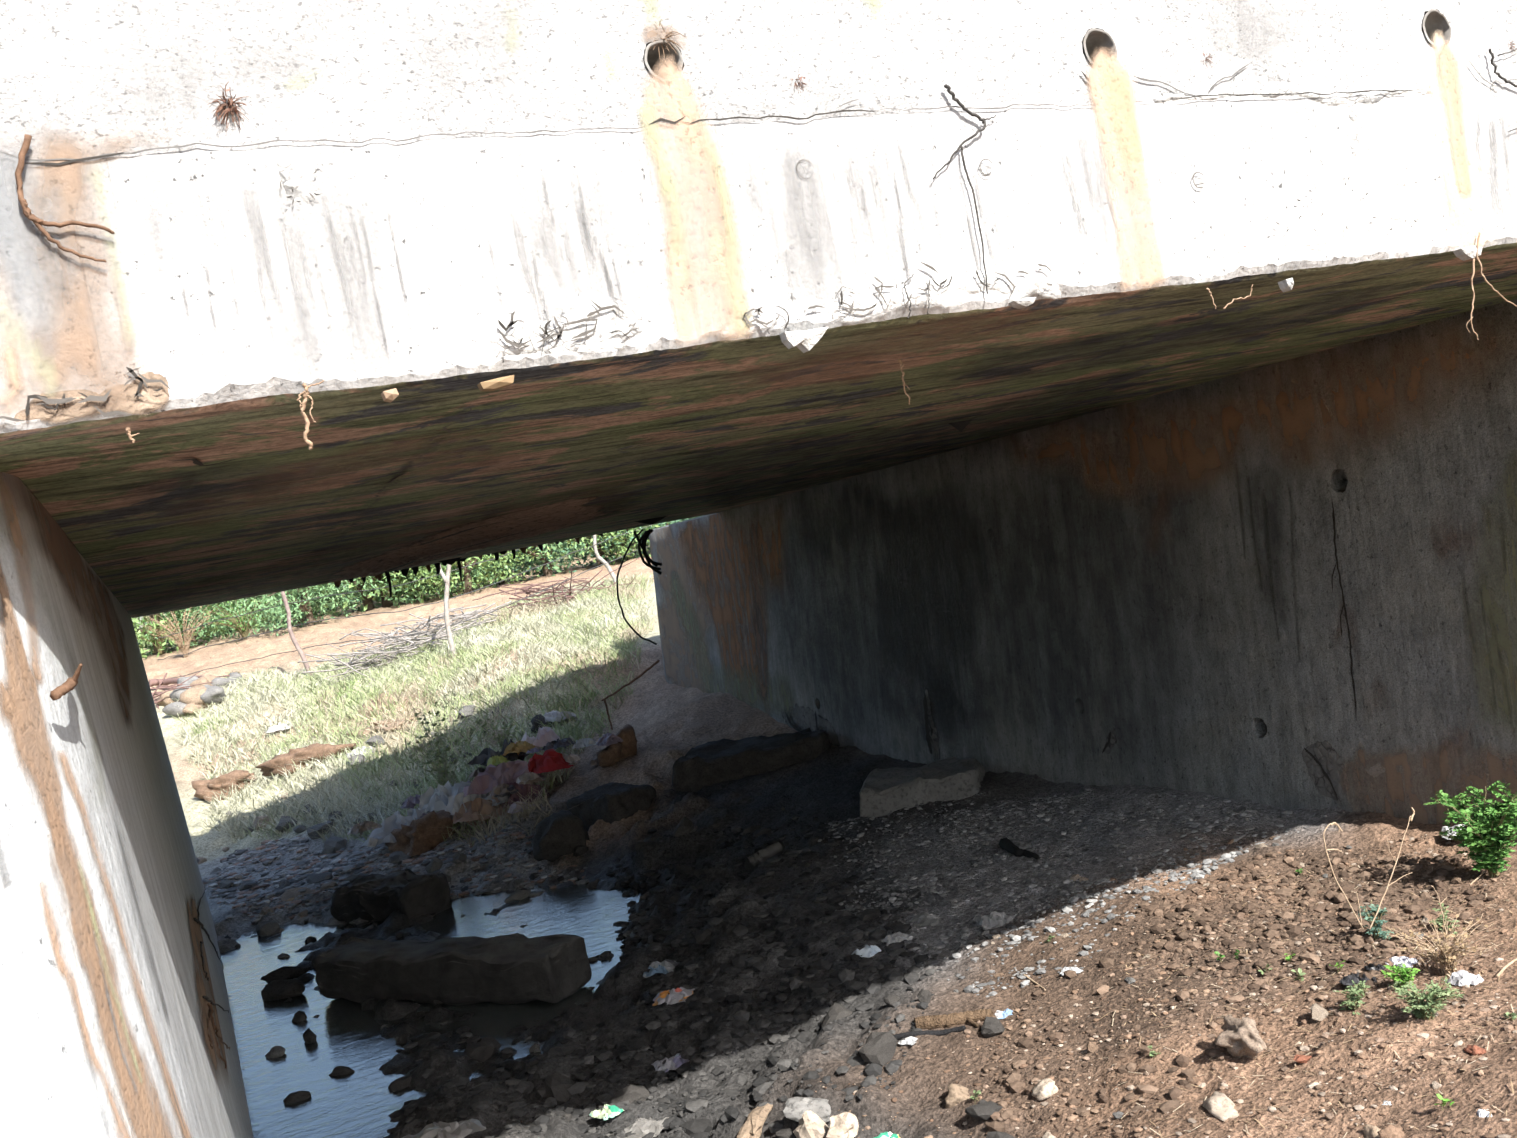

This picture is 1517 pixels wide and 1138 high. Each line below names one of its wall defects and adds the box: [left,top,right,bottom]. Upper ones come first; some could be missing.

crack [0,71,1094,166]
crack [1134,76,1201,102]
damp [514,188,620,316]
spalling [489,289,642,358]
spalling [722,262,1060,353]
peeling [477,375,514,392]
rust [29,491,130,721]
crack [1331,497,1357,721]
rust [187,898,227,1071]